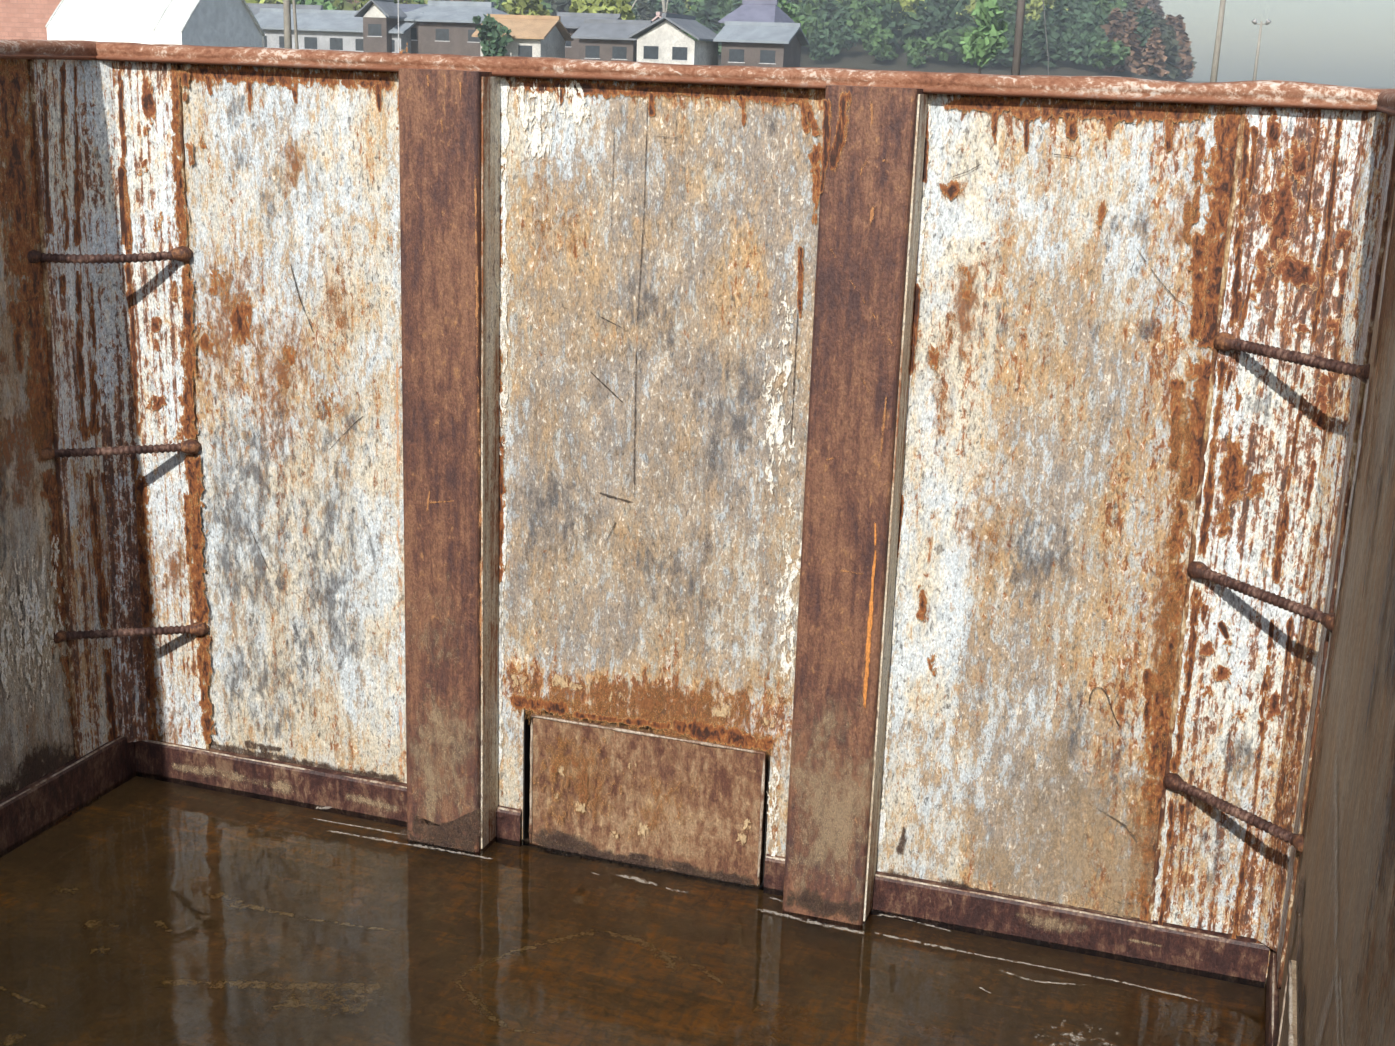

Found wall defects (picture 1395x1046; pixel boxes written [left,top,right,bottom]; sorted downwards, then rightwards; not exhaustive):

rust [0,61,102,627]
rust [117,66,143,436]
rust [169,64,399,246]
rust [910,252,989,376]
rust [1306,110,1342,343]
rust [86,469,110,629]
rust [133,256,403,783]
rust [500,670,790,833]
rust [916,585,927,621]
rust [922,95,1267,939]
rust [1255,616,1297,788]
rust [1272,370,1305,587]